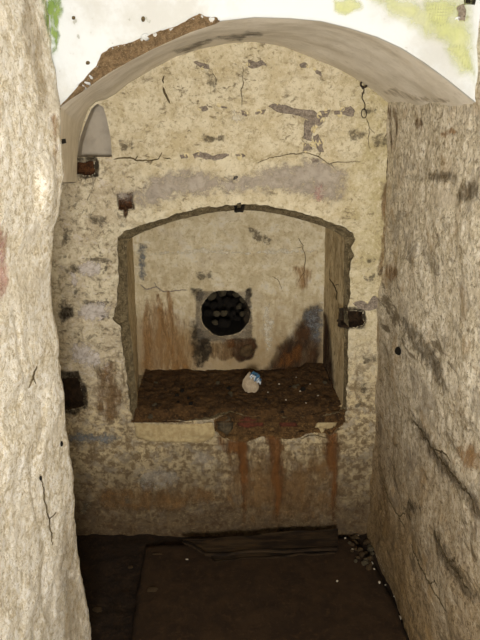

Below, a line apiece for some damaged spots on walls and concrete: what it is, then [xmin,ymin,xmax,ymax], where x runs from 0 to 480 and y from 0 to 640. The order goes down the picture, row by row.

flaking render [60,14,220,110]
crack [113,153,170,161]
flaking render [118,103,355,218]
crack [258,152,356,168]
corrosion [144,305,194,370]
corrosion [220,438,248,510]
corrosion [264,436,282,516]
corrosion [326,429,339,516]
crack [412,421,476,514]
crack [41,480,56,545]
crack [411,544,446,611]
crack [434,530,469,589]